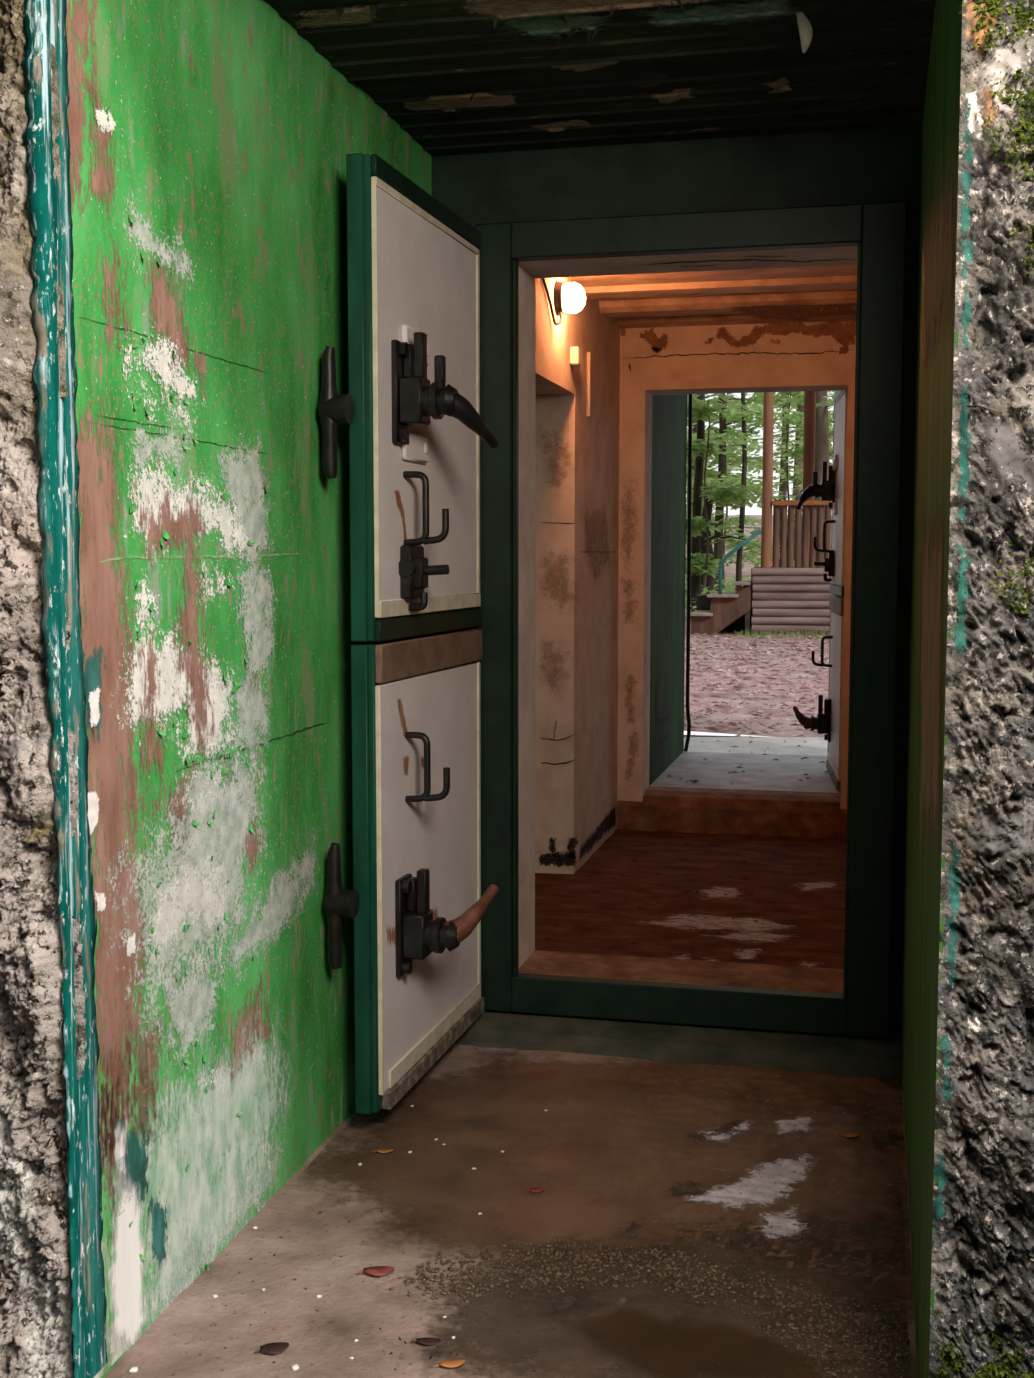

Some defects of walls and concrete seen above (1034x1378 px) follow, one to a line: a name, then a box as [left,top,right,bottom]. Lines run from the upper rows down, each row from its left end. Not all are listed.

peeling [285,3,381,28]
peeling [461,0,813,53]
peeling [402,91,517,113]
peeling [528,119,591,132]
peeling [650,85,697,103]
rust [91,233,132,352]
rust [144,258,206,398]
spalling [621,328,669,352]
spalling [705,303,856,354]
rust [77,400,215,1244]
peeling [88,326,320,1350]
leakage [308,1053,912,1378]